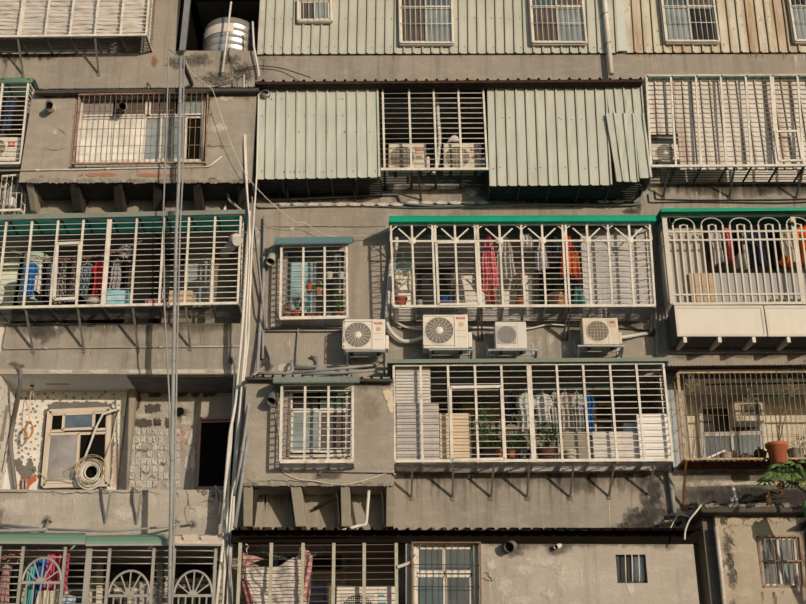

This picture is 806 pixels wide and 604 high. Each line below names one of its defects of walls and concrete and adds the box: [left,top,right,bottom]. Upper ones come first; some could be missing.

peeling [0,391,124,490]
peeling [135,393,217,472]
damp [543,472,668,531]
damp [677,471,806,505]
damp [794,516,806,540]
damp [724,537,736,585]